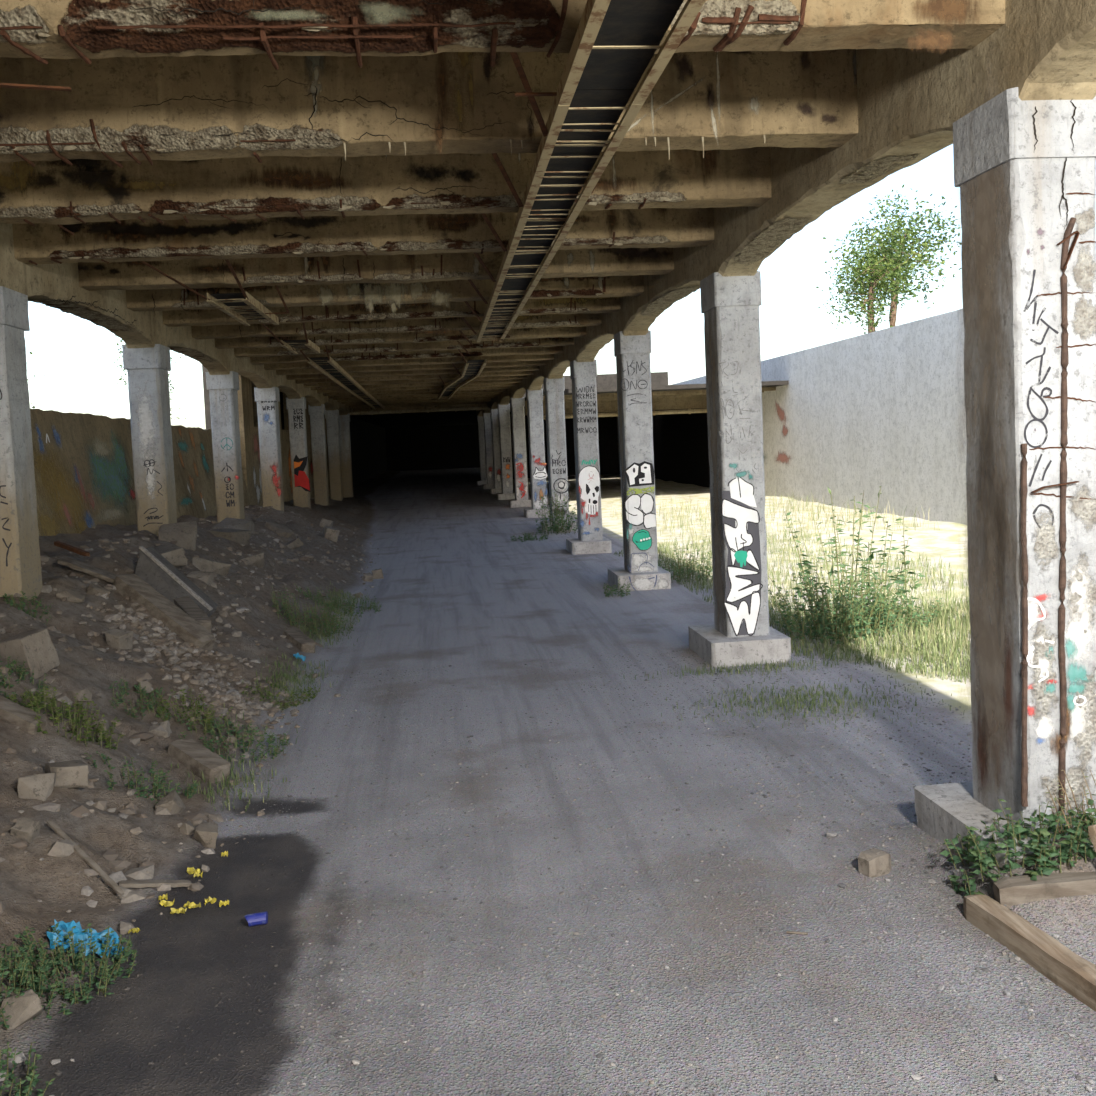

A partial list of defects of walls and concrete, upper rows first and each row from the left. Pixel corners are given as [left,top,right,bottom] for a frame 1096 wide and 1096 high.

spalling [0,0,568,70]